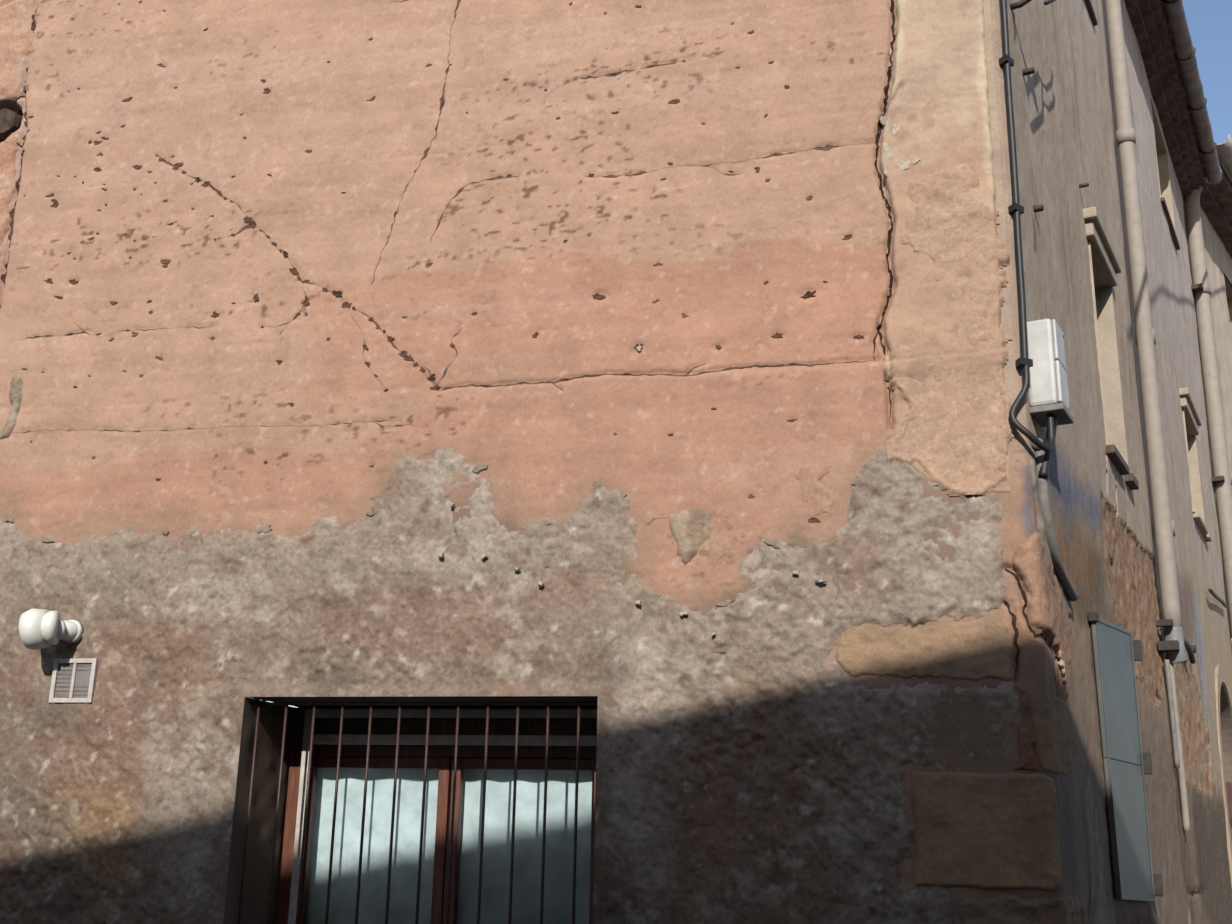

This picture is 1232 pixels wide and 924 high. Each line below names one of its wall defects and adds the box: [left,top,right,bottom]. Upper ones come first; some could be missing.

spalling [0,115,34,256]
spalling [88,131,109,211]
crack [11,0,896,433]
flaking render [879,0,1015,496]
flaking render [0,442,1020,924]
spalling [1100,491,1213,799]